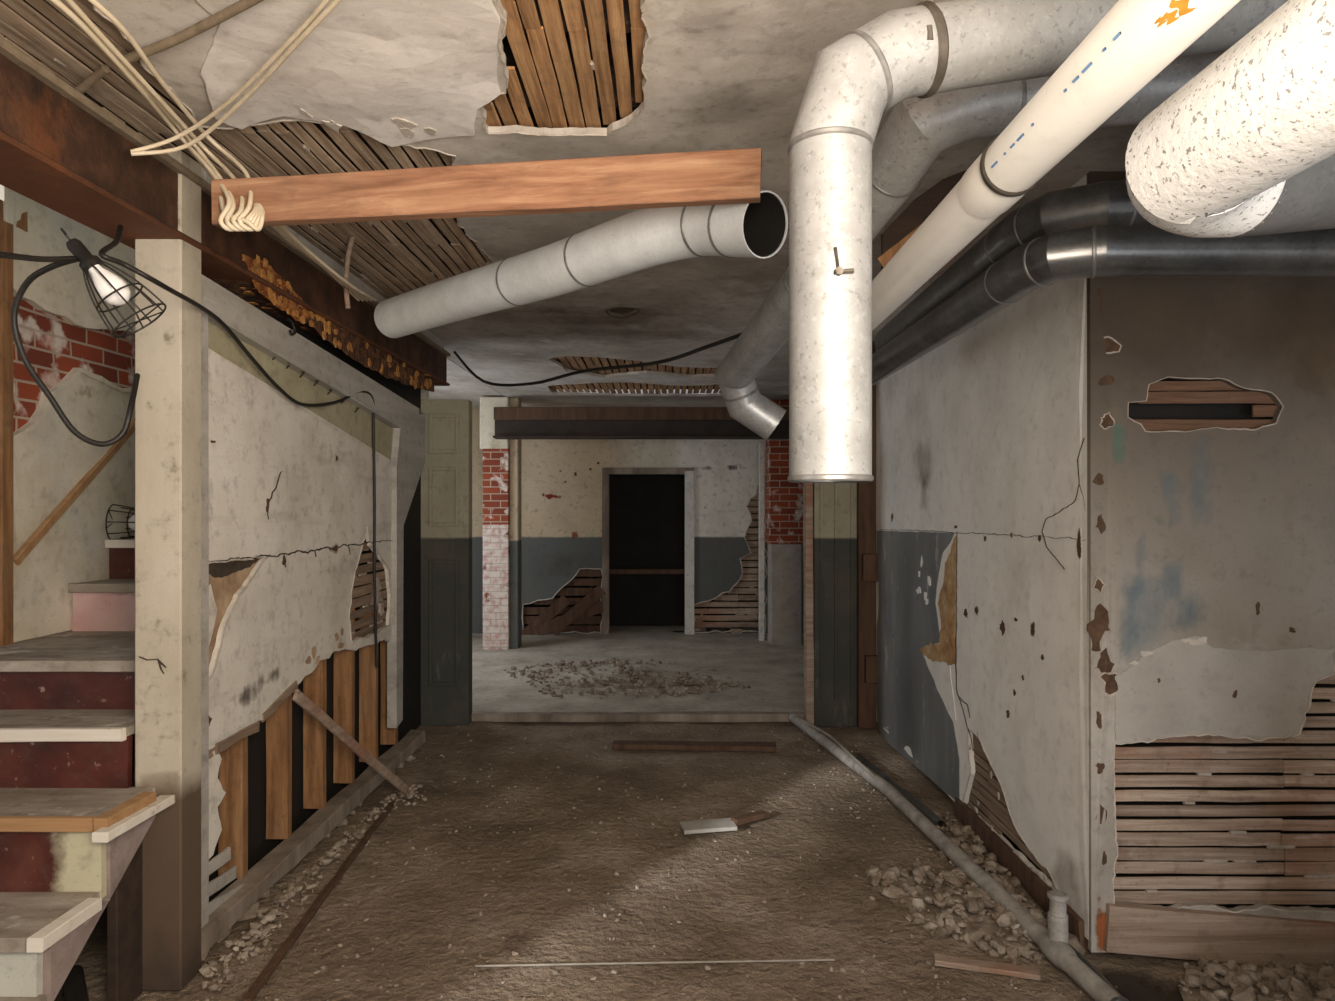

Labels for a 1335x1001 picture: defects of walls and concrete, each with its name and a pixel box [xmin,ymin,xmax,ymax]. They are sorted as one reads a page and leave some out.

flaking render [0,0,456,179]
flaking render [480,0,650,137]
corrosion [1154,0,1196,28]
flaking render [288,218,494,299]
spalling [13,284,135,440]
flaking render [209,555,286,681]
crack [267,471,282,519]
crack [209,540,392,567]
crack [880,438,1085,751]
flaking render [209,680,298,915]
peeling [877,513,1058,890]
spalling [1087,576,1335,913]